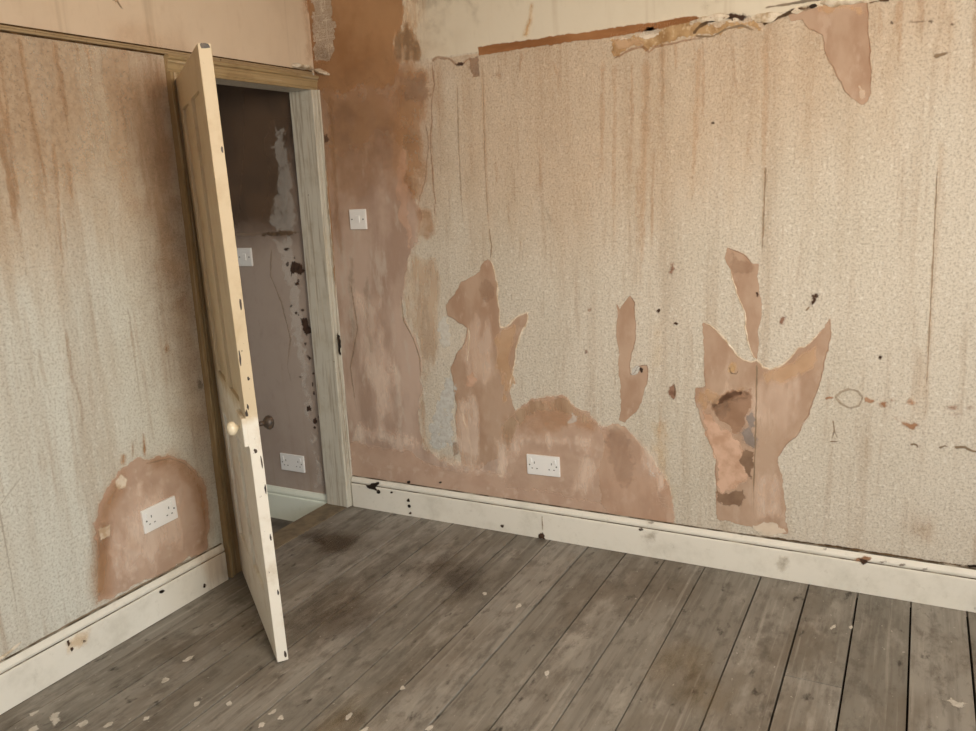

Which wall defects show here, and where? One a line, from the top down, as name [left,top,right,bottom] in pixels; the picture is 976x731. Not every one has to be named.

spalling [611,0,889,57]
water stain [0,32,83,166]
flaking render [216,84,293,228]
water stain [322,71,426,195]
flaking render [292,0,674,531]
water stain [96,523,107,593]
peeling [116,475,127,489]
peeling [699,389,755,506]
peeling [753,522,786,536]